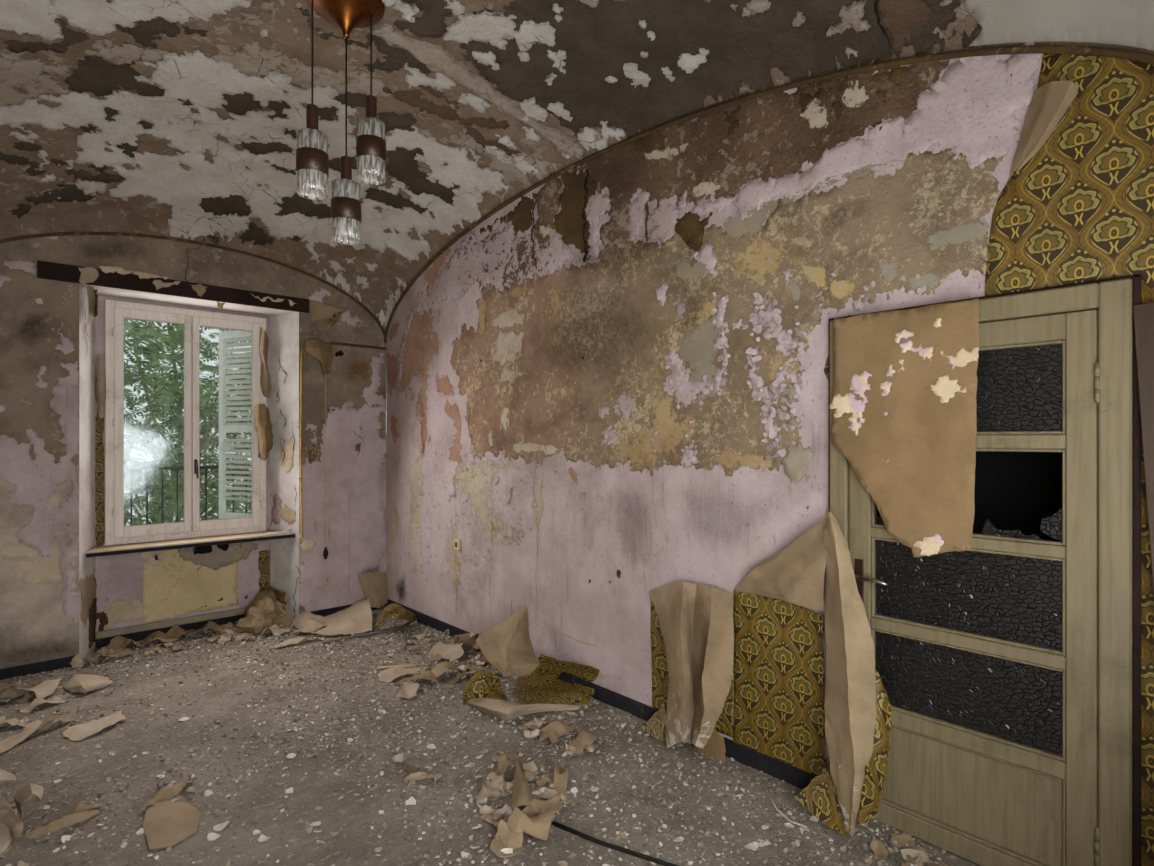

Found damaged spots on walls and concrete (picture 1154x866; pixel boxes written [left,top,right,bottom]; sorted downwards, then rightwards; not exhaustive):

peeling [0,0,1154,648]